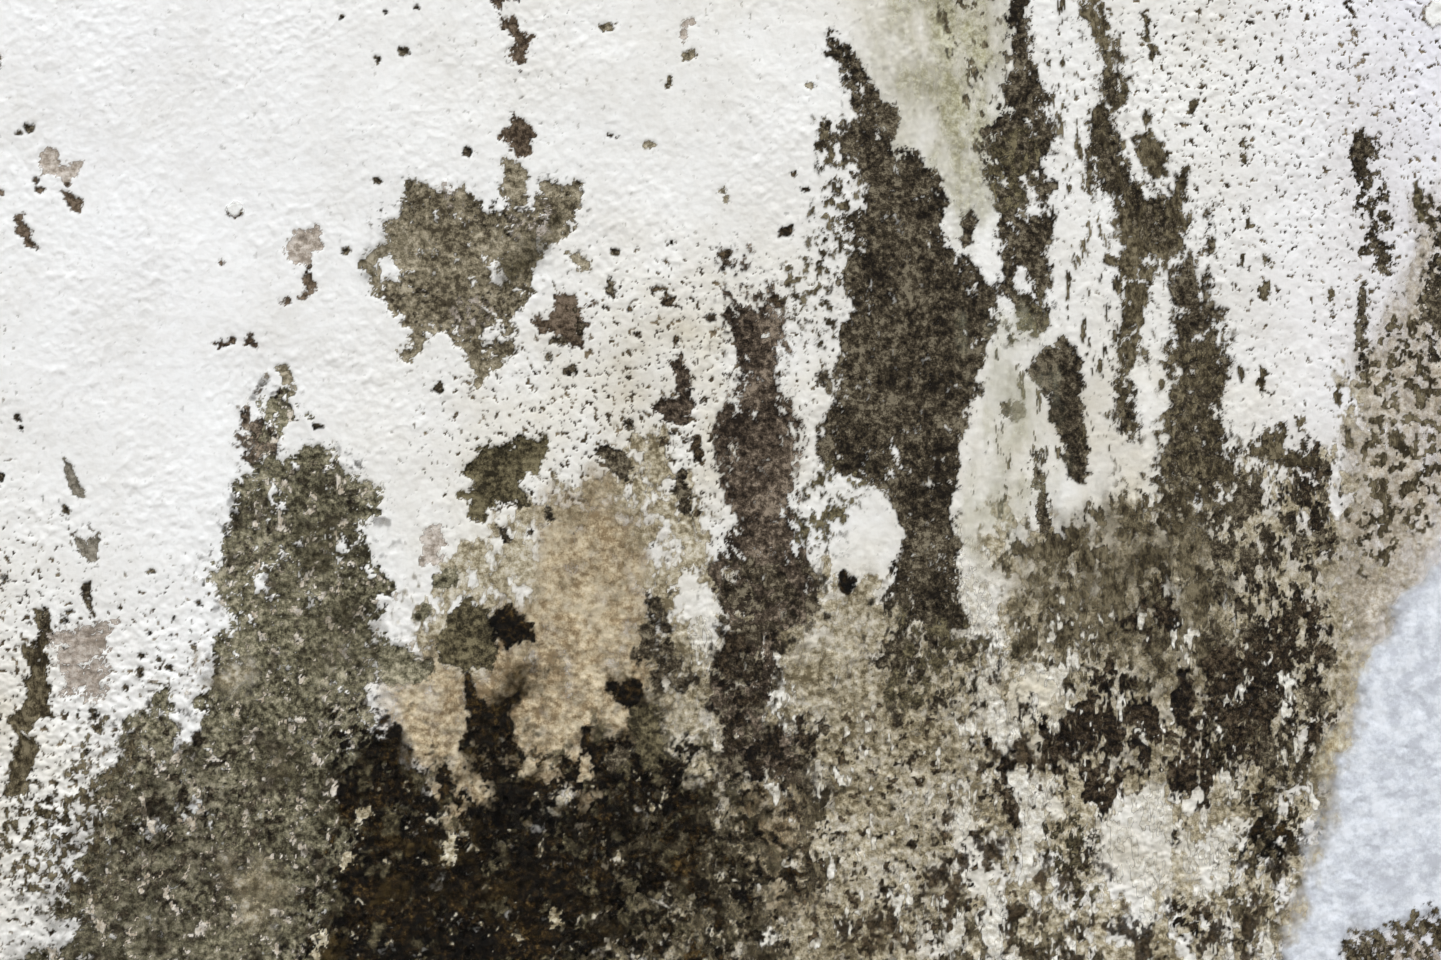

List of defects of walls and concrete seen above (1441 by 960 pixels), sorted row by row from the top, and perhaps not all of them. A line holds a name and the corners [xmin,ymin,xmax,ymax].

peeling [490,0,536,73]
peeling [598,22,617,33]
peeling [680,18,698,62]
peeling [280,224,324,306]
peeling [341,113,633,392]
peeling [717,249,733,260]
peeling [778,224,794,237]
peeling [651,285,677,307]
peeling [769,293,782,308]
water stain [295,0,1441,960]